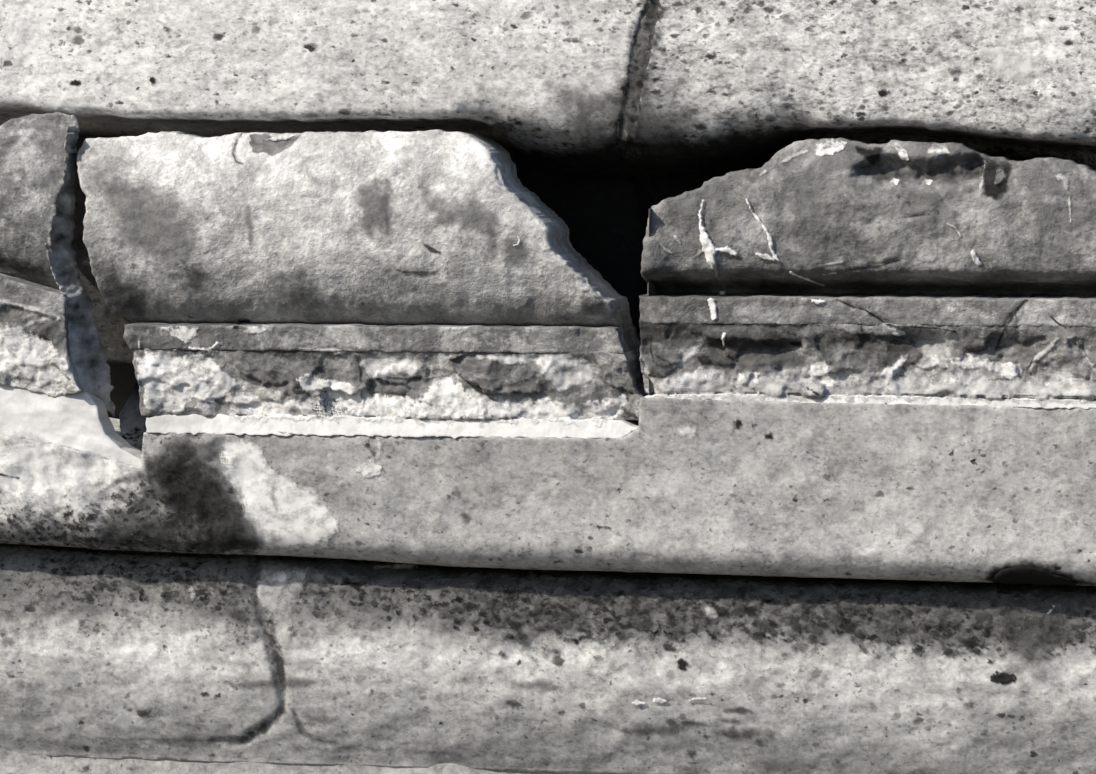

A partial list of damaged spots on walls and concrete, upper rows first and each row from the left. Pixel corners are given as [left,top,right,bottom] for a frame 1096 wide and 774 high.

water stain [558,0,690,155]
spalling [516,200,546,231]
crack [851,260,898,270]
spalling [575,275,601,297]
crack [690,320,818,328]
crack [836,299,956,332]
crack [991,293,1066,380]
crack [648,335,677,378]
crack [159,620,285,743]